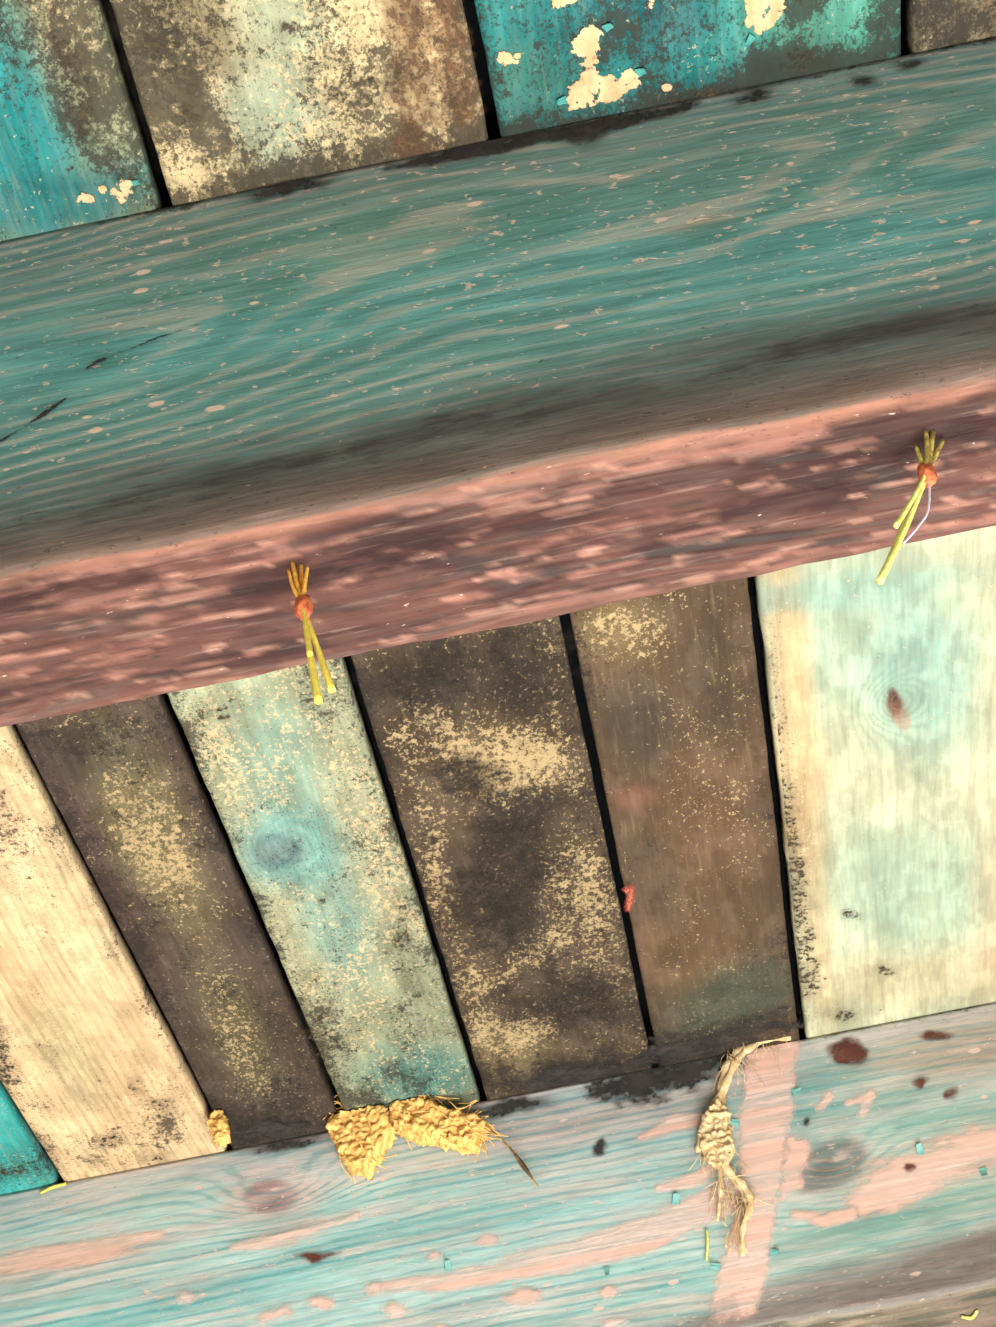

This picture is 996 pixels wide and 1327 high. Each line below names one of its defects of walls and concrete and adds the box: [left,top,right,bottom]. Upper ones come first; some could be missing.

water stain [44,4,94,147]
water stain [129,0,246,84]
water stain [305,0,473,155]
peeling [497,51,521,66]
peeling [552,0,577,9]
peeling [557,23,647,111]
peeling [744,0,786,46]
crack [86,329,181,369]
crack [0,398,66,442]
peeling [368,1042,810,1322]
peeling [791,1128,996,1227]
peeling [0,1233,162,1274]